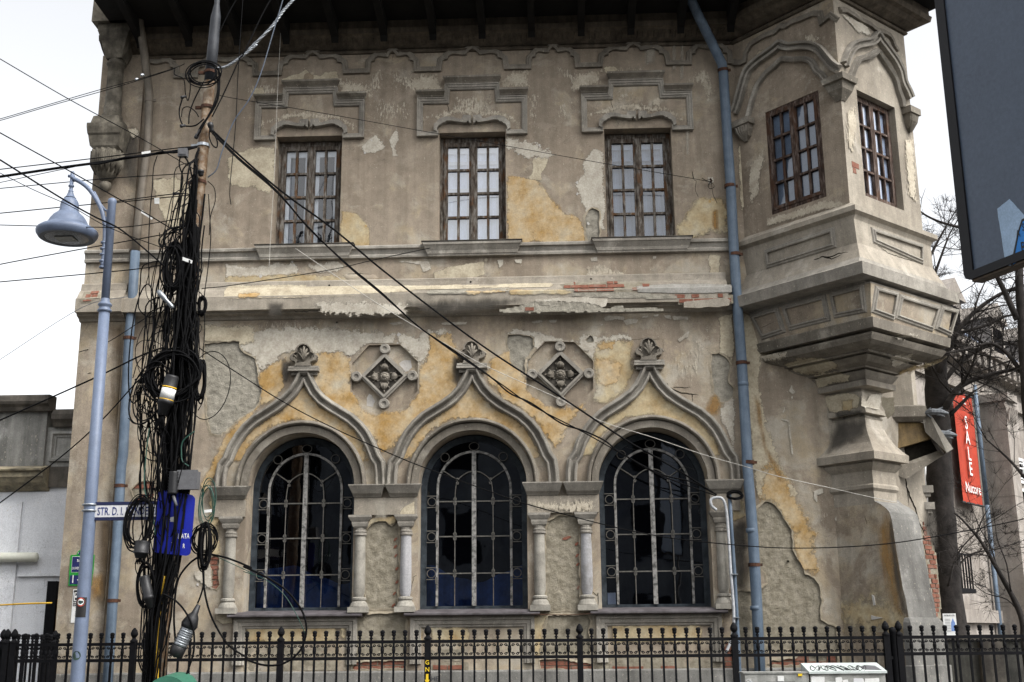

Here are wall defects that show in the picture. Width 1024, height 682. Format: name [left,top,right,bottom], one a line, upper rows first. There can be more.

peeling [246,67,442,156]
peeling [423,70,606,242]
peeling [340,211,370,246]
peeling [677,197,728,238]
spalling [194,255,895,671]
crack [905,479,926,541]